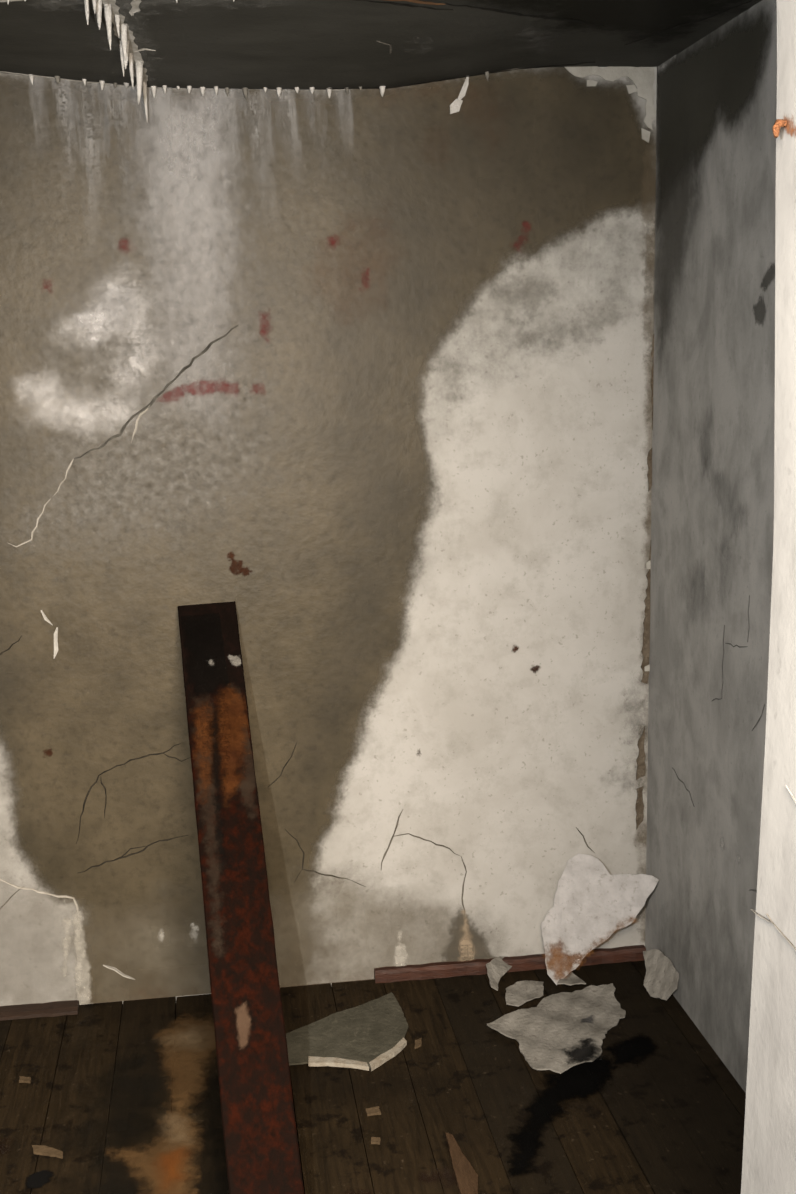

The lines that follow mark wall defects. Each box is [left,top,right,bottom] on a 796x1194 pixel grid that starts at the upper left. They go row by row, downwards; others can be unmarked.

leakage [655,10,771,343]
leakage [753,263,775,323]
crack [7,325,238,547]
leakage [0,67,656,1005]
flaking render [641,547,651,684]
crack [0,743,191,912]
crack [285,810,467,917]
flaking render [636,726,646,829]
crack [749,889,796,951]
rust [120,1019,216,1194]